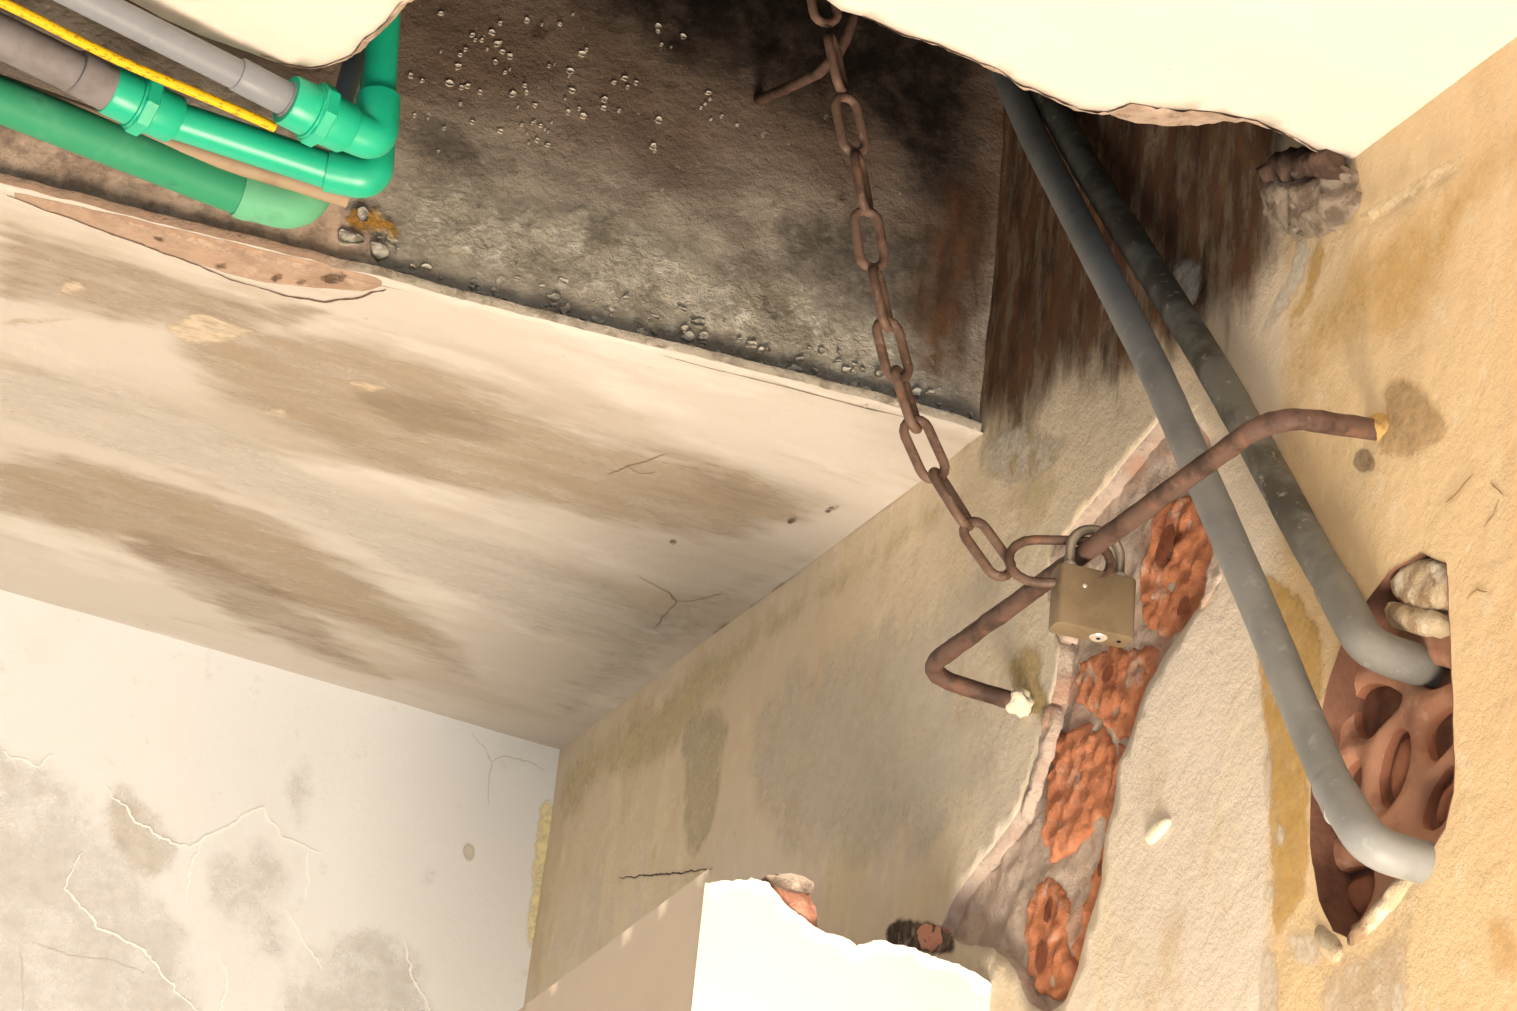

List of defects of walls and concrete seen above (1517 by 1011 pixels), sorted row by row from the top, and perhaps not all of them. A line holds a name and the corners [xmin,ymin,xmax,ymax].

damp [0,377,686,666]
damp [199,336,796,528]
spalling [0,0,1319,422]
damp [376,180,986,412]
corrosion [979,105,1131,422]
corrosion [1042,120,1176,349]
corrosion [1069,105,1281,314]
damp [0,796,187,1011]
flaking render [761,873,818,928]
flaking render [886,491,1223,1011]
peeling [1259,663,1413,966]
spalling [1366,553,1455,847]